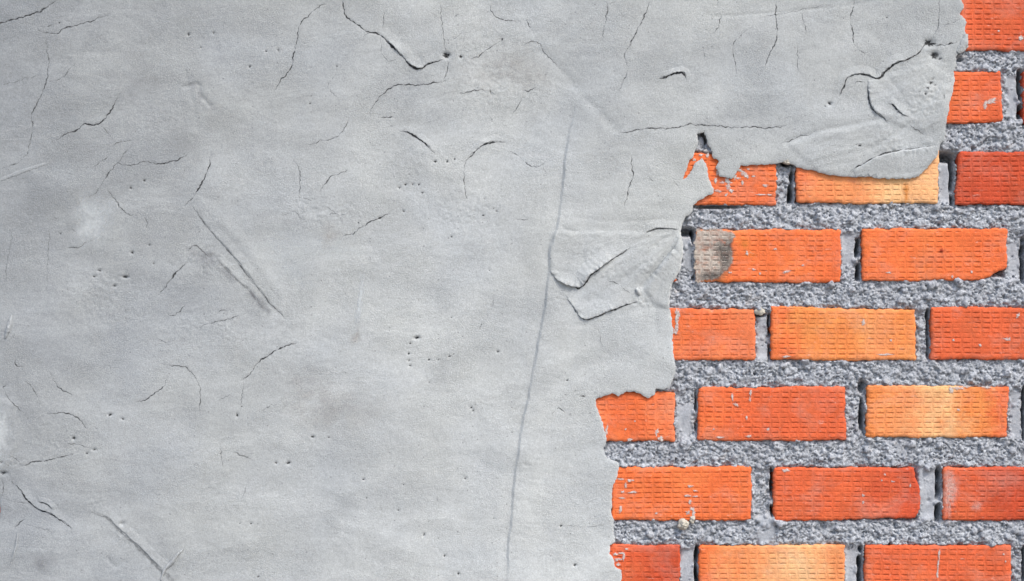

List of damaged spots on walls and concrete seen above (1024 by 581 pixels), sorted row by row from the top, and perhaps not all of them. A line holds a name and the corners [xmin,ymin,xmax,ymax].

crack [0,2,97,165]
crack [59,97,118,139]
crack [83,140,184,213]
crack [277,1,385,86]
crack [372,12,459,118]
spalling [693,133,709,161]
crack [624,123,801,200]
peeling [714,168,772,196]
flaking render [956,34,968,54]
crack [3,363,84,466]